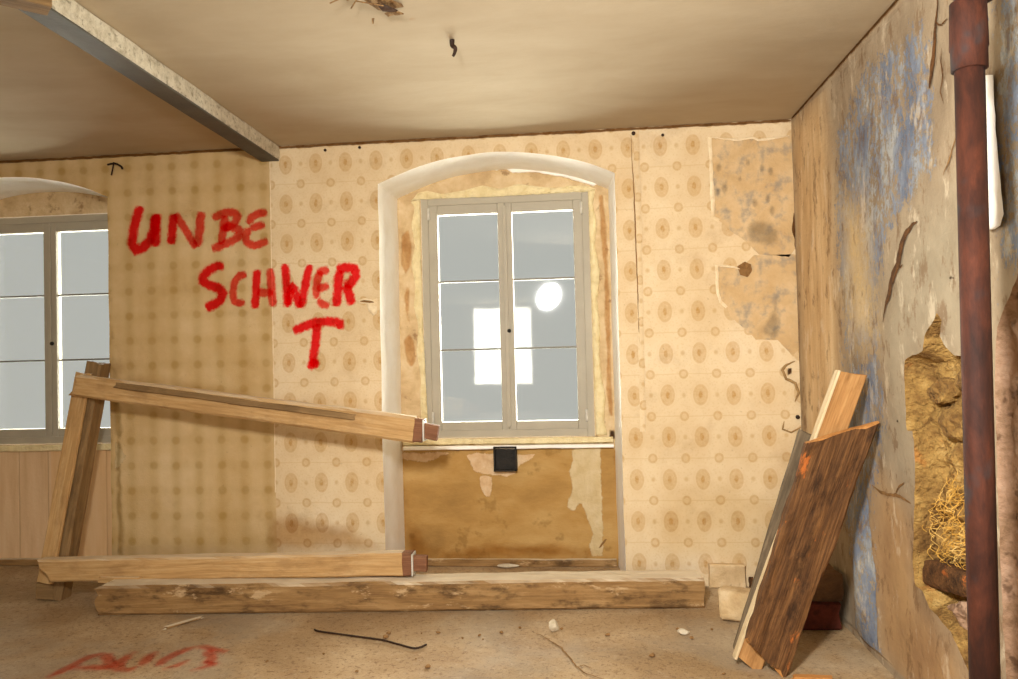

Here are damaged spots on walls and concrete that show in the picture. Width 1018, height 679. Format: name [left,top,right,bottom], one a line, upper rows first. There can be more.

spalling [330,0,404,24]
crack [929,0,946,104]
crack [0,149,244,163]
crack [269,0,898,399]
flaking render [986,75,1004,230]
crack [883,221,917,319]
crack [271,424,279,492]
flaking render [567,448,607,556]
spalling [897,313,969,671]
flaking render [994,275,1018,679]
crack [536,633,602,679]